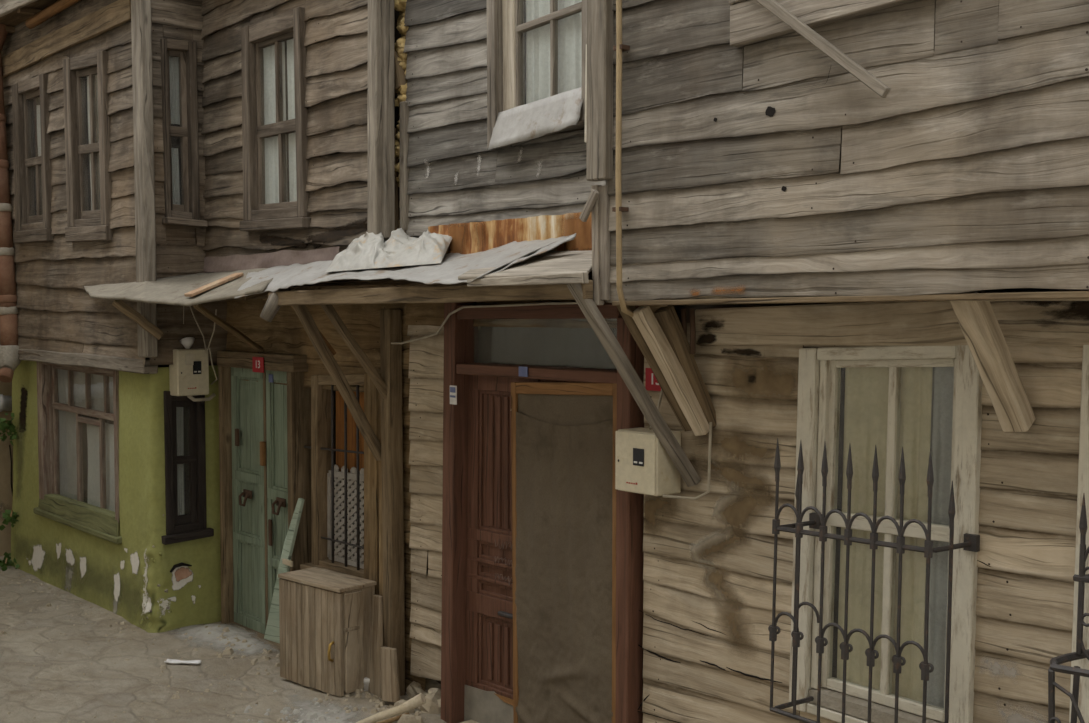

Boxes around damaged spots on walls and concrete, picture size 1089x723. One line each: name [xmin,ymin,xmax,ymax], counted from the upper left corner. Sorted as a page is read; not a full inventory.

corrosion [448,223,484,254]
corrosion [563,214,592,251]
peeling [28,543,87,588]
flaking render [113,545,201,620]